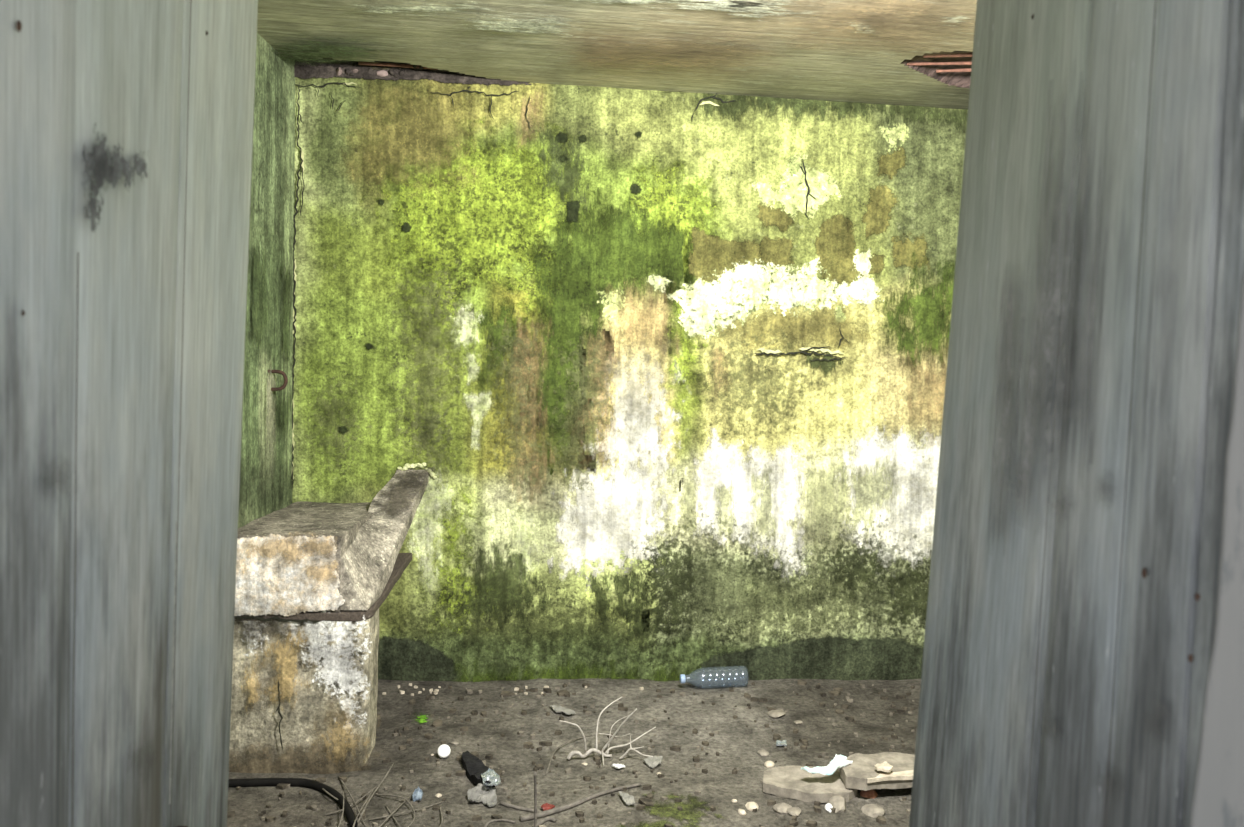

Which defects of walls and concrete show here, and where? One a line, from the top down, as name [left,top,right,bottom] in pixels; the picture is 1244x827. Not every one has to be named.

leakage [696,93,968,130]
leakage [409,125,795,462]
leakage [717,147,955,378]
leakage [378,510,932,682]